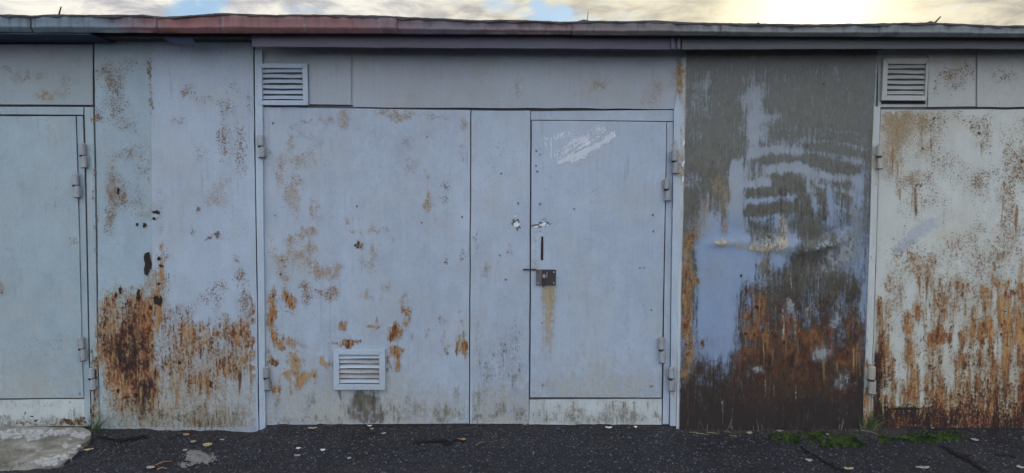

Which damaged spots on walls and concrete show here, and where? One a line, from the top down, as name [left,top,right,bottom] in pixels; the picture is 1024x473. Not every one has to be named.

corrosion [90,55,154,131]
corrosion [4,132,342,427]
corrosion [336,297,413,372]
corrosion [681,110,1024,429]